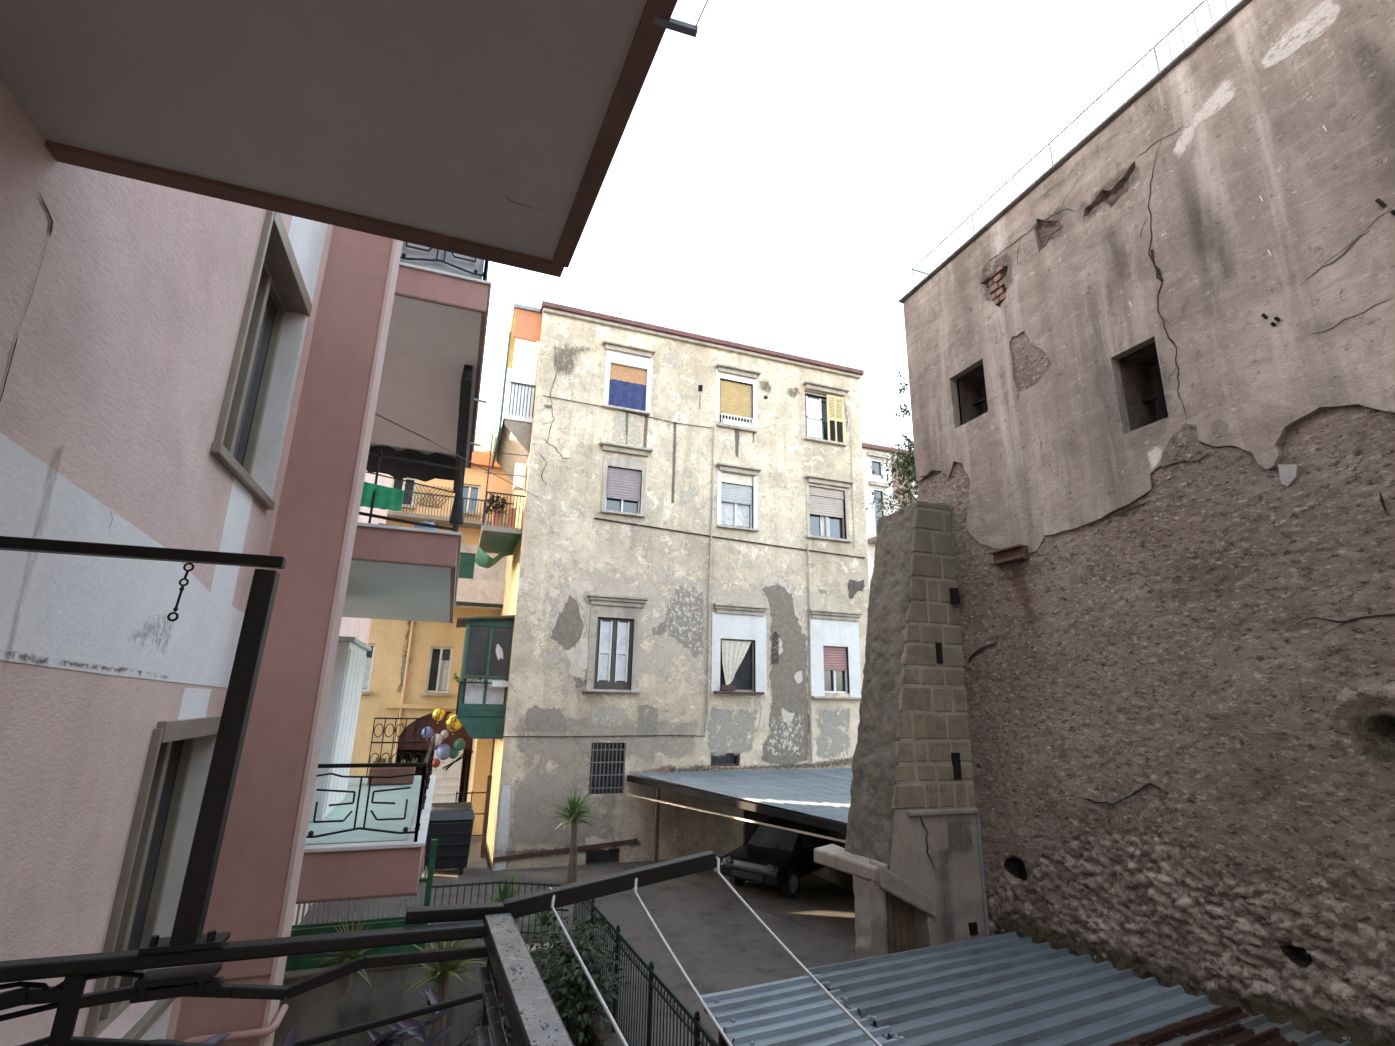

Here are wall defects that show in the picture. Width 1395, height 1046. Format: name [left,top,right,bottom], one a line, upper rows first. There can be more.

spalling [1088,179,1129,215]
crack [1307,205,1395,279]
spalling [985,266,1008,307]
crack [1136,128,1187,419]
spalling [1010,332,1052,393]
spalling [1160,420,1228,467]
crack [1297,614,1395,635]
spalling [540,559,865,770]
corrosion [1109,1005,1298,1046]